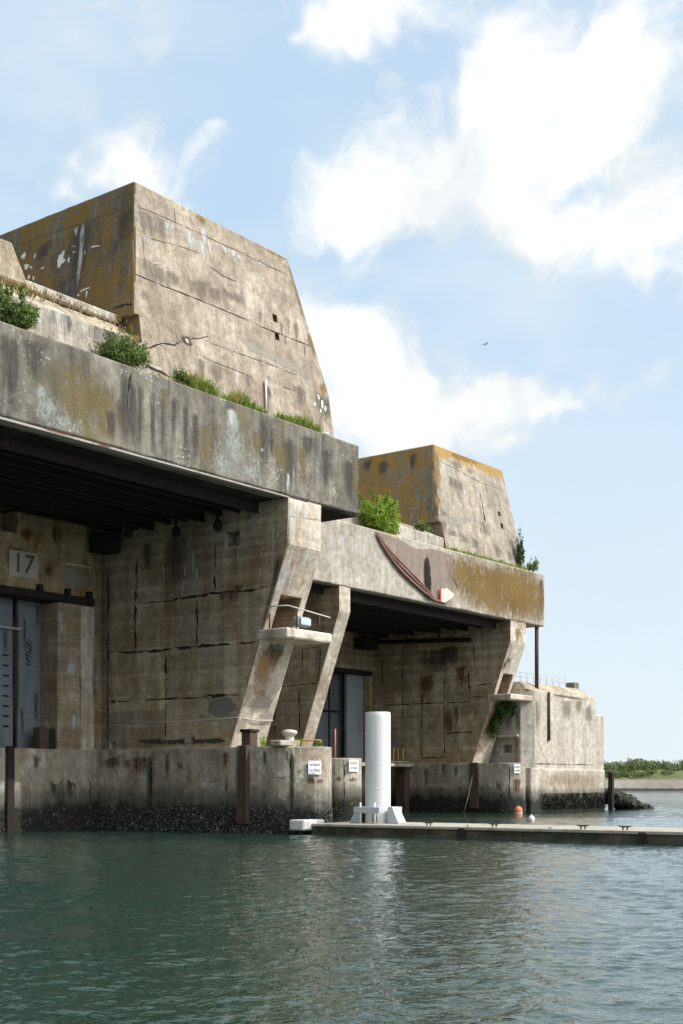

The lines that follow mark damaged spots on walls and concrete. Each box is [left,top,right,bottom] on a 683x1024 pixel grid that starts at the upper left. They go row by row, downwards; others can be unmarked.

crack [17,206,310,346]
water stain [108,382,213,463]
crack [108,336,318,411]
water stain [261,426,311,489]
water stain [314,395,329,415]
water stain [346,460,387,490]
crack [107,545,267,741]
crack [382,644,488,759]
corrosion [106,756,147,770]